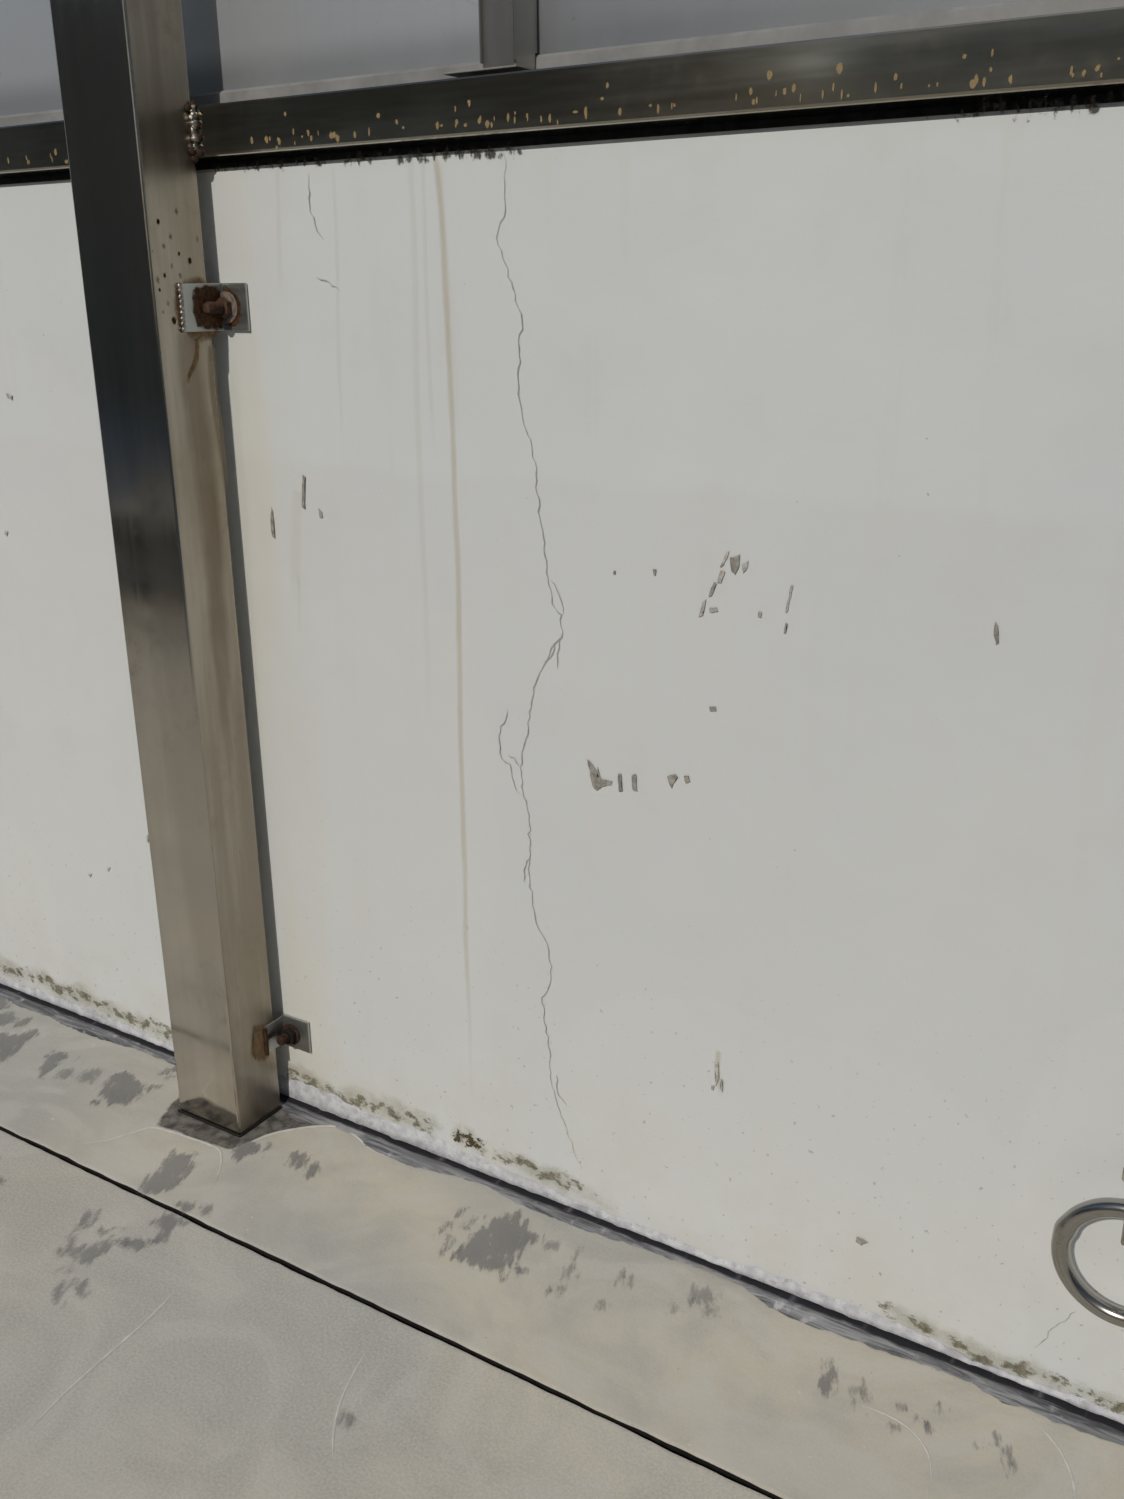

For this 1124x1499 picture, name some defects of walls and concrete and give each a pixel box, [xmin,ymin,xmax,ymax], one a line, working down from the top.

leakage [436,83,609,129]
leakage [957,49,1124,122]
corrosion [173,252,240,379]
peeling [699,551,748,617]
crack [496,151,582,1170]
peeling [587,759,637,792]
peeling [667,774,690,788]
leakage [159,1098,327,1149]